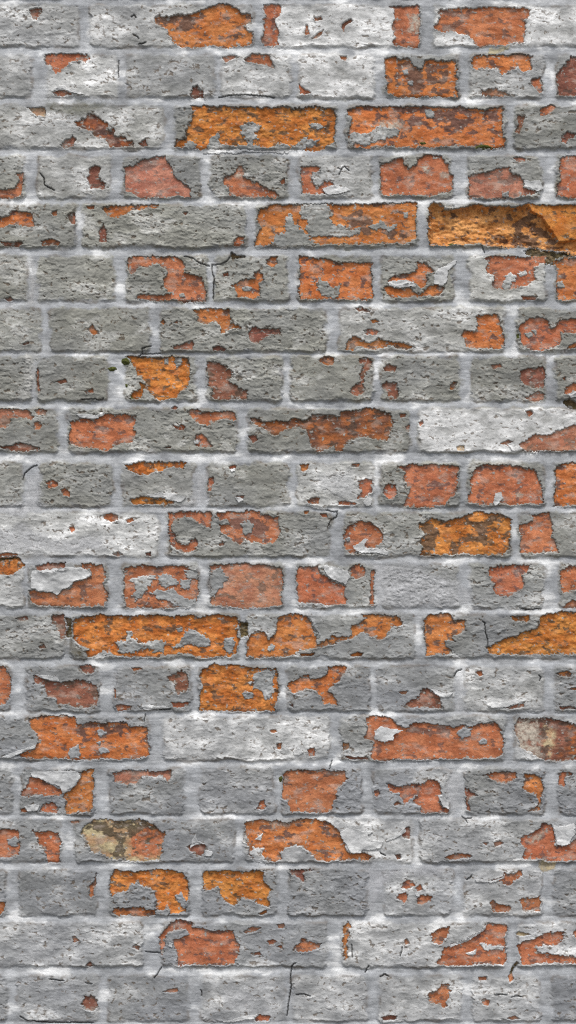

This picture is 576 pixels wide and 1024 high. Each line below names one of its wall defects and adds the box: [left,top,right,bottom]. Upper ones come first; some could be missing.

peeling [61,4,576,452]
peeling [130,492,281,553]
peeling [304,425,576,597]
peeling [486,566,576,655]
peeling [0,521,410,967]
peeling [343,699,576,787]